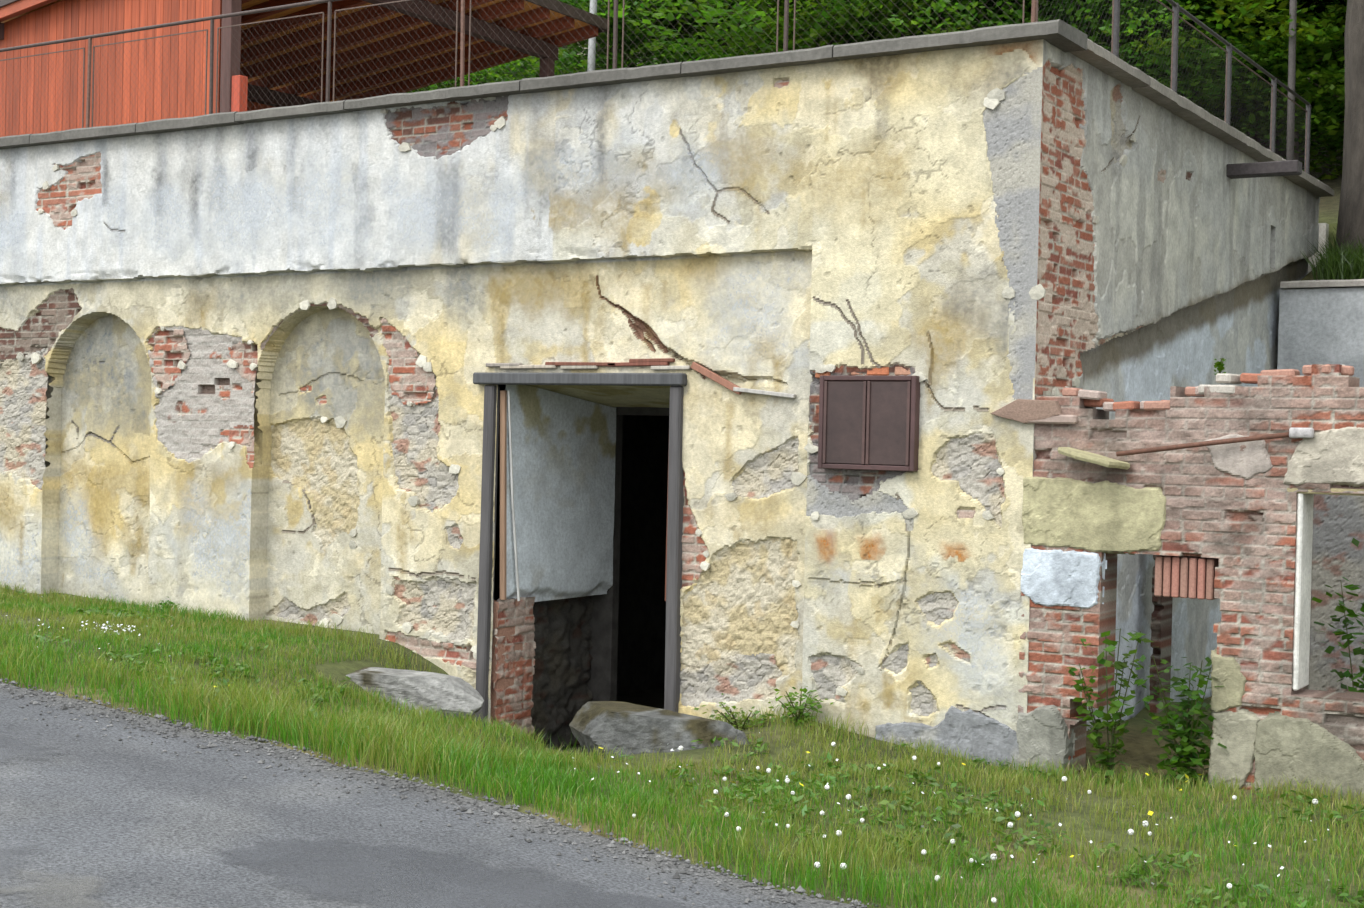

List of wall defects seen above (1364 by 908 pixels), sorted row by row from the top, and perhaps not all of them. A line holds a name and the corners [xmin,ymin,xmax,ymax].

flaking render [36,152,102,230]
flaking render [380,95,509,160]
crack [679,129,770,224]
flaking render [982,60,1143,400]
spalling [0,288,82,490]
spalling [147,297,461,513]
crack [596,275,706,379]
crack [813,296,883,368]
crack [924,332,989,412]
spalling [271,385,360,552]
spalling [385,577,477,671]
spalling [680,470,865,707]